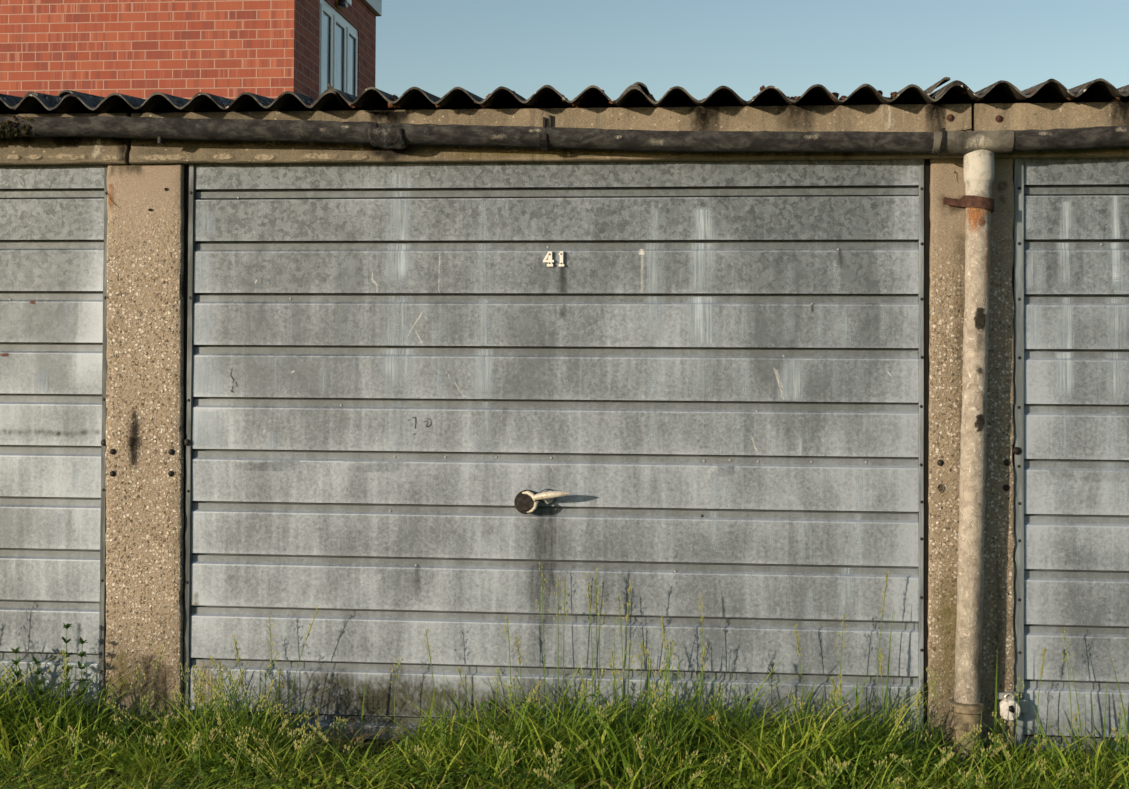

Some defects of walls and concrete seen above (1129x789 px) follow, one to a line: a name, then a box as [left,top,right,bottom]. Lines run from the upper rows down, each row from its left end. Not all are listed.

damp [371,146,408,161]
damp [385,174,409,384]
damp [690,209,712,344]
damp [127,412,139,461]